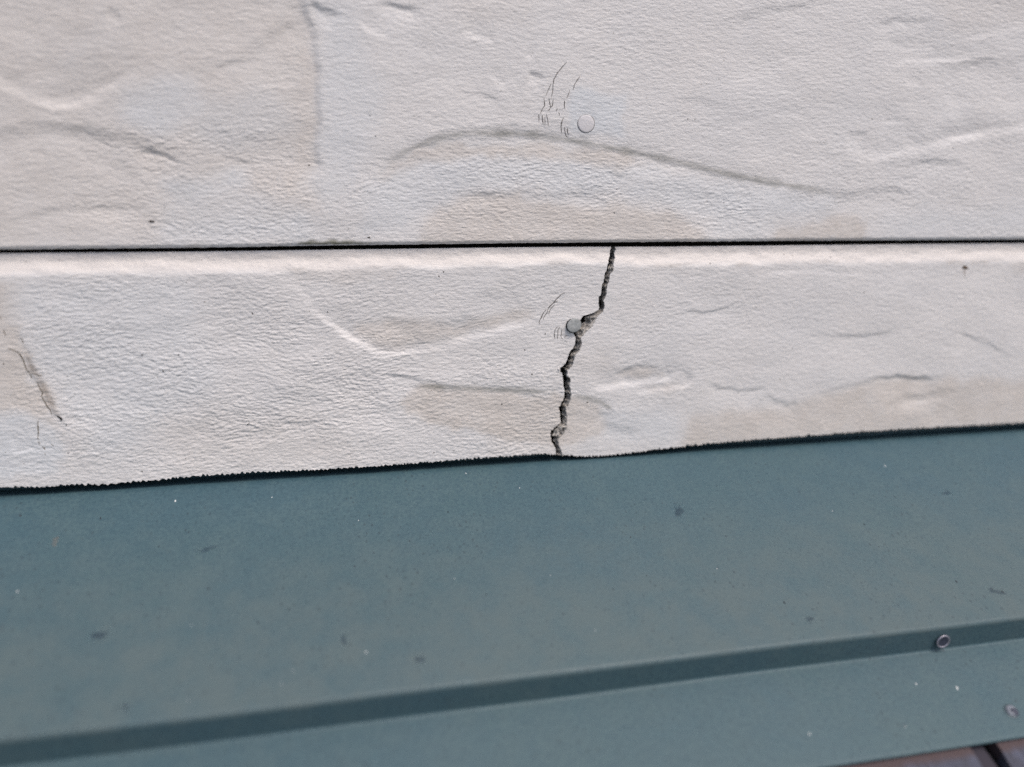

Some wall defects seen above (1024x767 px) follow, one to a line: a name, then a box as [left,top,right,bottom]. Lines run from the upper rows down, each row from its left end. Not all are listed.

crack [539,246,616,456]